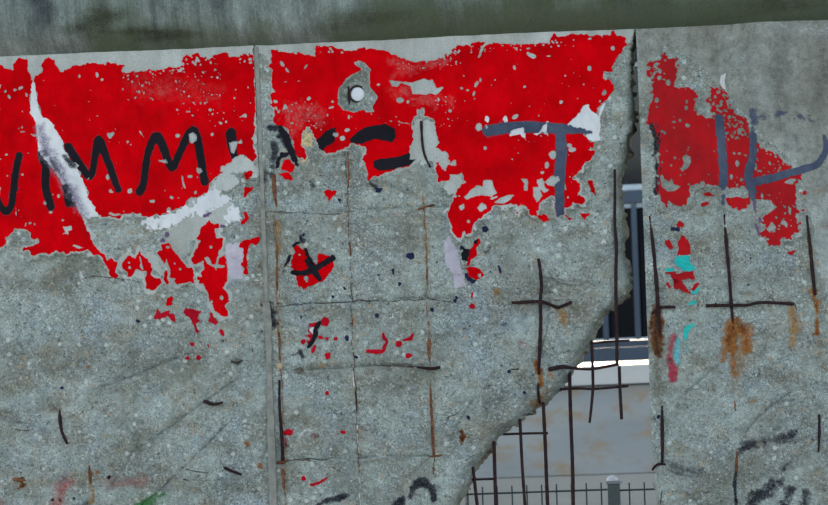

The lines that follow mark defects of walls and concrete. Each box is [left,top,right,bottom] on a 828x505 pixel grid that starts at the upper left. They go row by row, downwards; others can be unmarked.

spalling [0,49,270,505]
spalling [258,31,828,505]
rust [648,305,665,374]
rust [721,317,754,376]
rust [809,288,820,353]
rust [532,360,554,407]